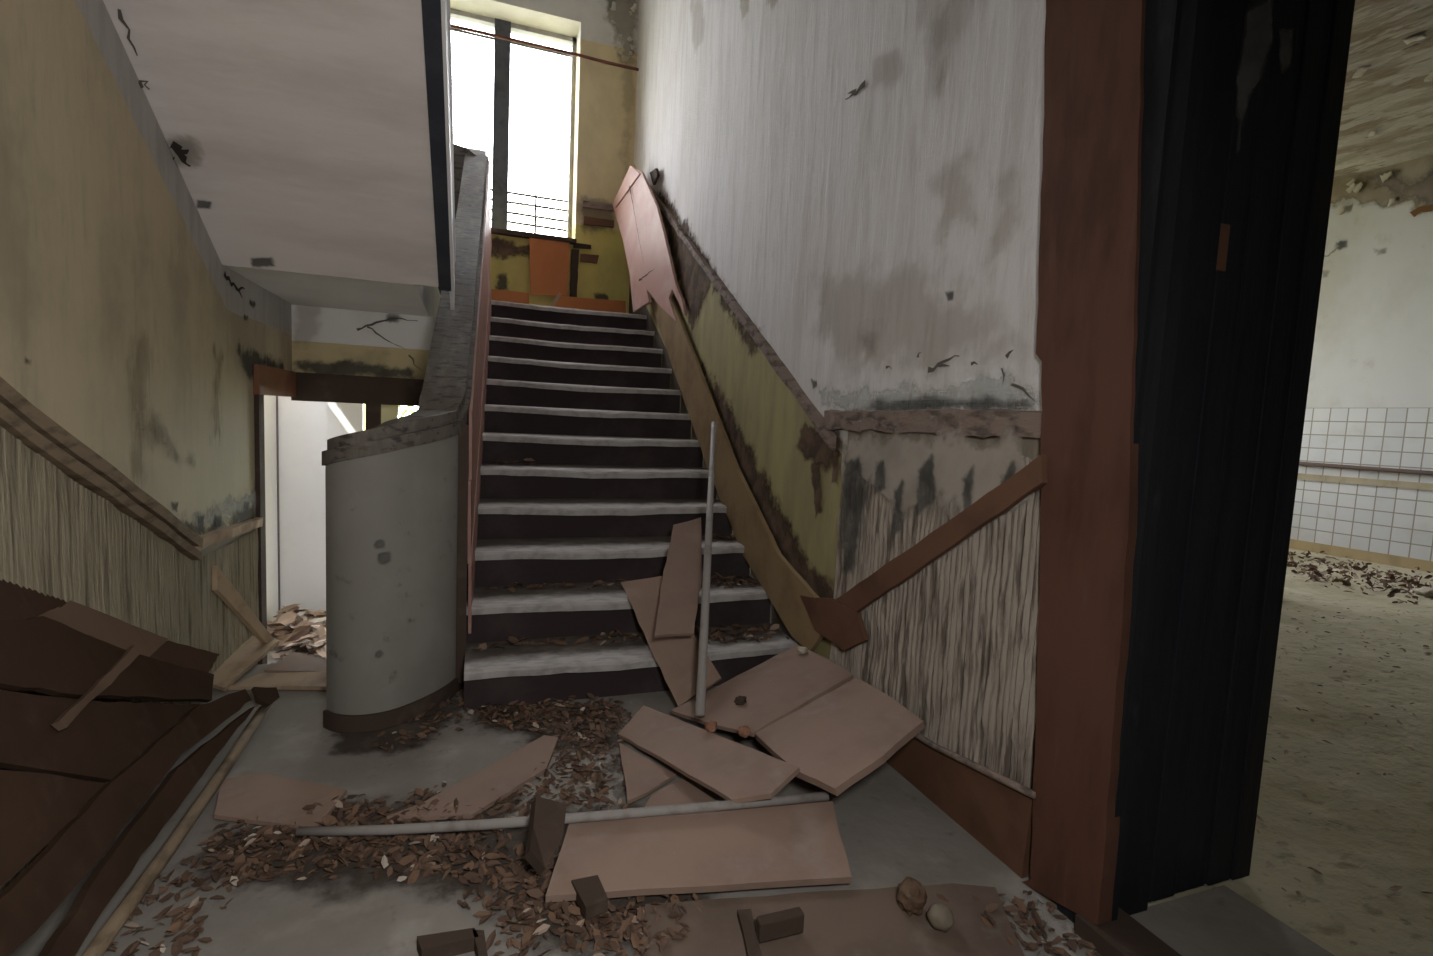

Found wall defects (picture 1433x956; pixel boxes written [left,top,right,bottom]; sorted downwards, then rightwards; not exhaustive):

peeling [607,0,638,62]
flaking render [1331,154,1433,217]
water stain [657,191,758,355]
water stain [854,397,1032,411]
water stain [171,501,254,534]
water stain [699,362,834,598]
water stain [797,423,935,572]
water stain [963,469,973,510]